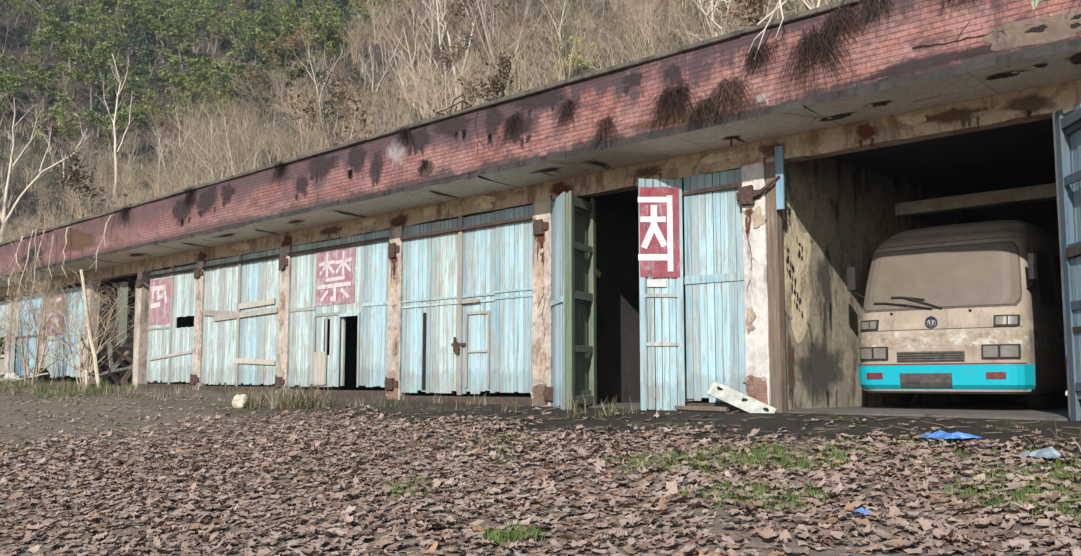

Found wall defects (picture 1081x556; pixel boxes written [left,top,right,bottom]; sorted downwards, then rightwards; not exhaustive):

spalling [983,7,1081,51]
water stain [486,90,563,147]
water stain [294,117,470,200]
water stain [173,183,235,225]